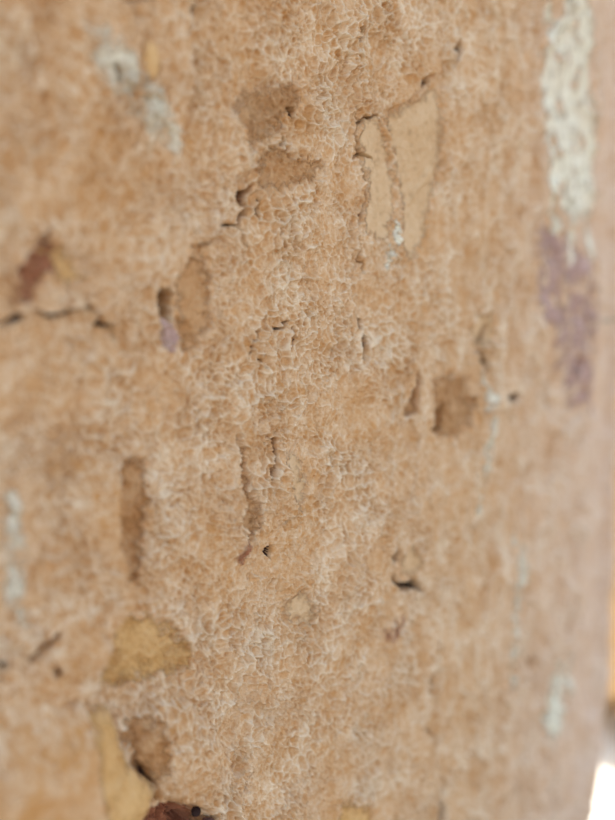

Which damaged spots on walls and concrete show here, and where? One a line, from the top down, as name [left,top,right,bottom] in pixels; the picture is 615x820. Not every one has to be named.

crack [0,302,111,328]
spalling [143,801,192,820]